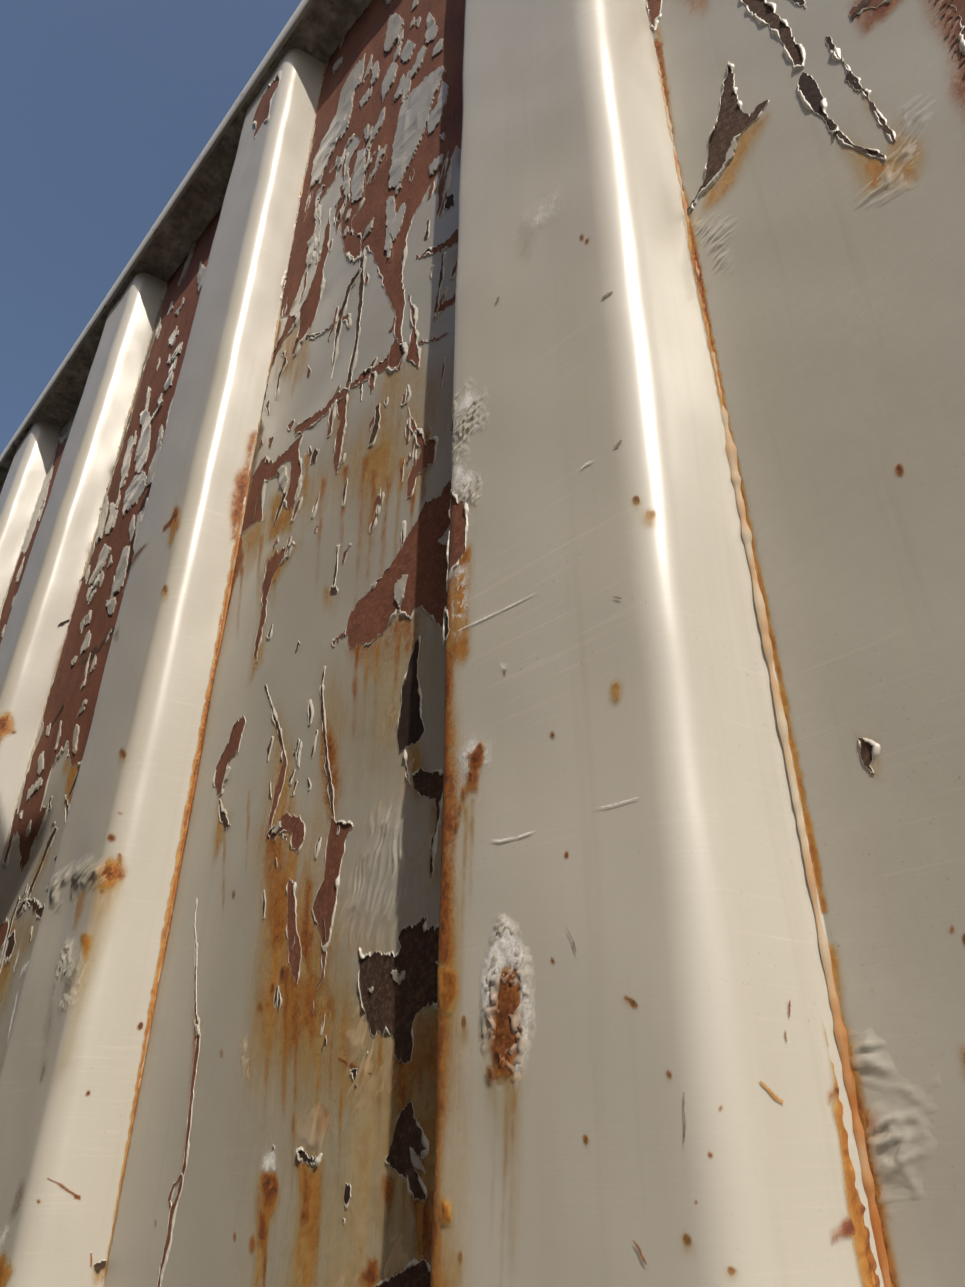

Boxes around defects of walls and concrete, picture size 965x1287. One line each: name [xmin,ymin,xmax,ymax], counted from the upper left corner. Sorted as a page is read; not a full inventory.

peeling [0,207,222,981]
corrosion [103,420,278,1287]
peeling [262,666,354,1051]
peeling [233,0,471,879]
corrosion [255,591,536,1287]
peeling [646,0,662,31]
corrosion [682,188,733,440]
peeling [687,61,769,215]
corrosion [737,457,827,913]
corrosion [828,945,898,1287]
corrosion [858,737,881,774]
peeling [848,0,898,30]